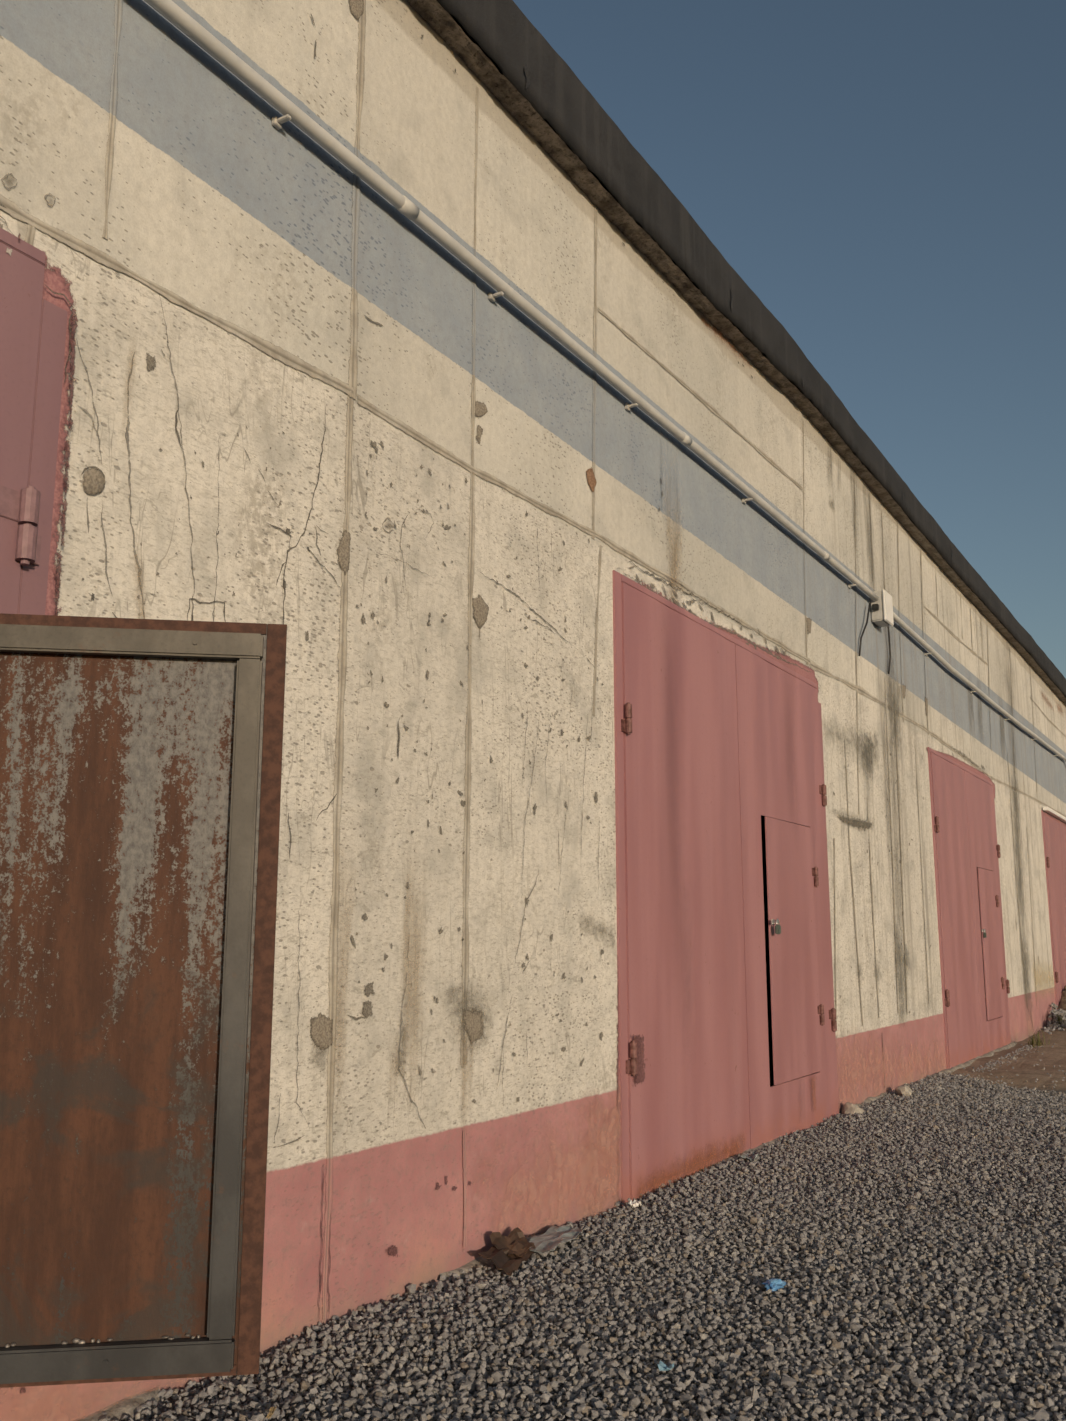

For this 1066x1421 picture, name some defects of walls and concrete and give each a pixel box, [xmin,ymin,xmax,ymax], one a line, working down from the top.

crack [45,285,226,622]
crack [266,409,341,624]
corrosion [0,613,287,1388]